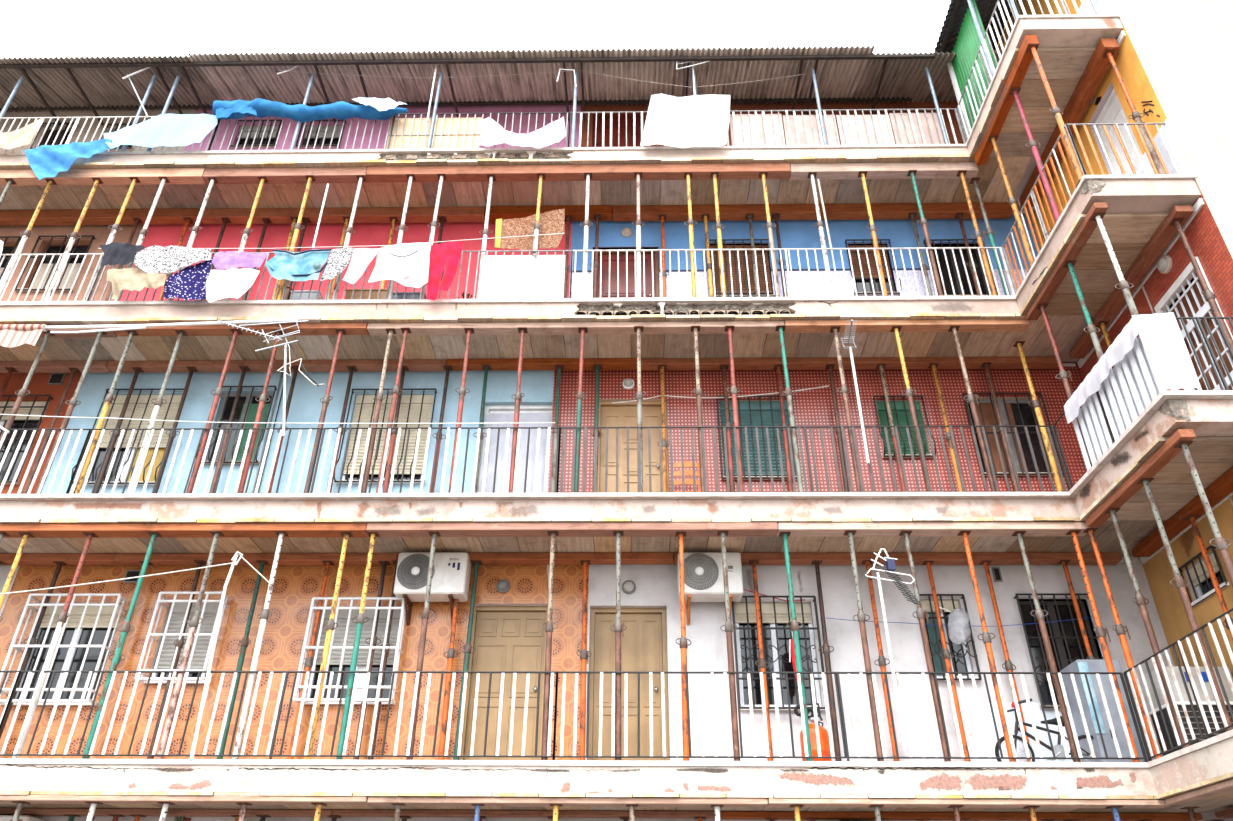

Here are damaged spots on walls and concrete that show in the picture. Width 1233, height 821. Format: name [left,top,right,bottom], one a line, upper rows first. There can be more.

peeling [779,772,855,786]
peeling [920,773,1027,792]
peeling [1076,773,1136,788]